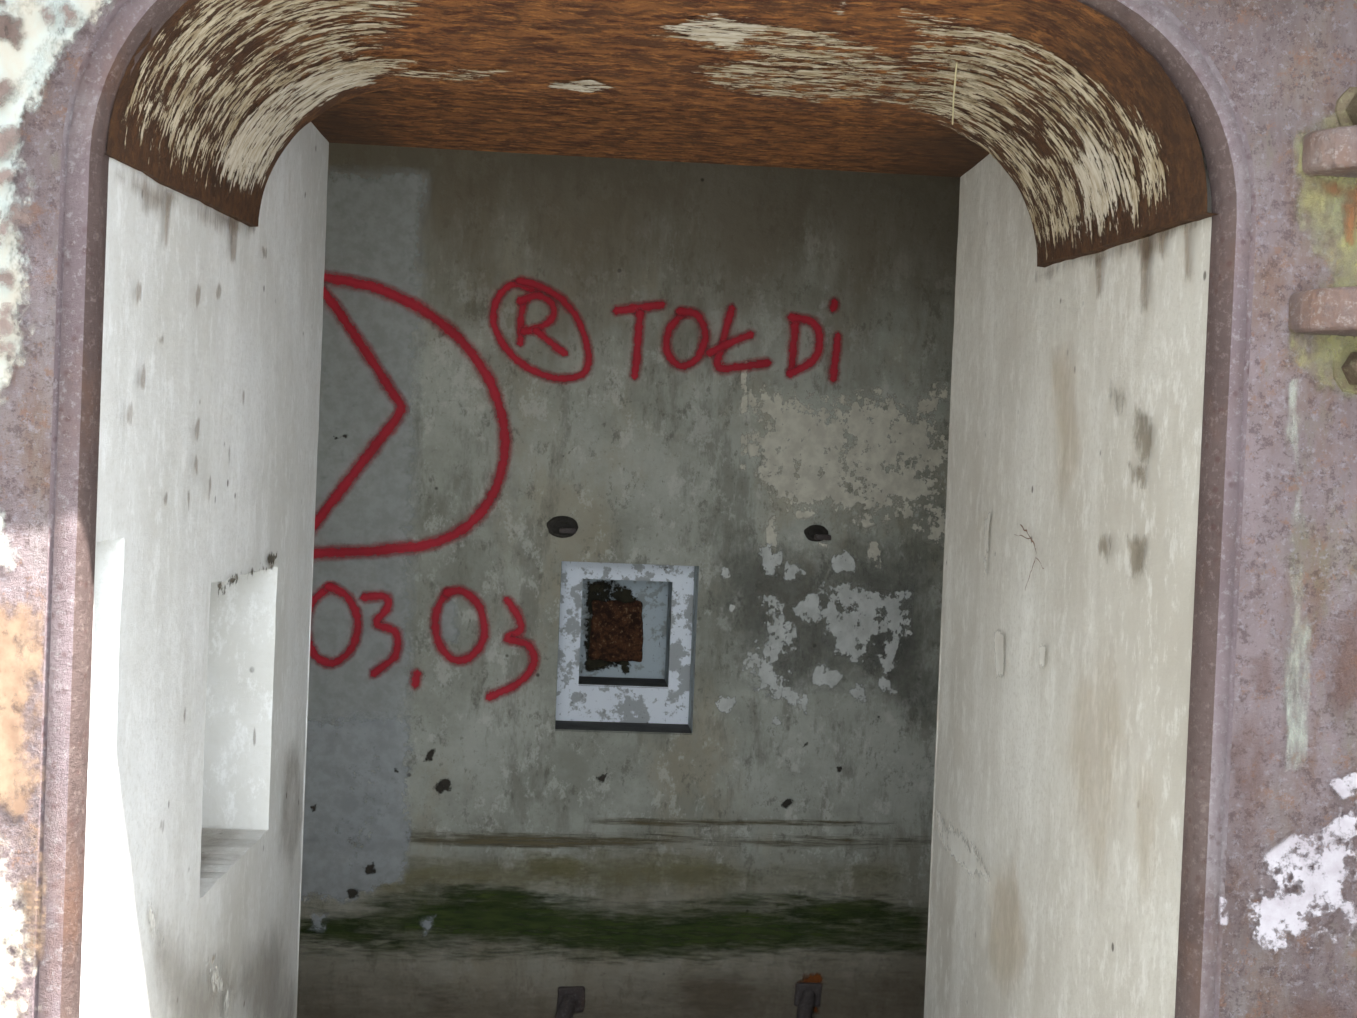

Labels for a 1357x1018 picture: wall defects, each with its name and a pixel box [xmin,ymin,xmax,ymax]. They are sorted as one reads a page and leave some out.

peeling [0,0,110,388]
peeling [740,361,948,714]
rust [0,604,43,815]
peeling [715,696,736,713]
rust [18,877,45,955]